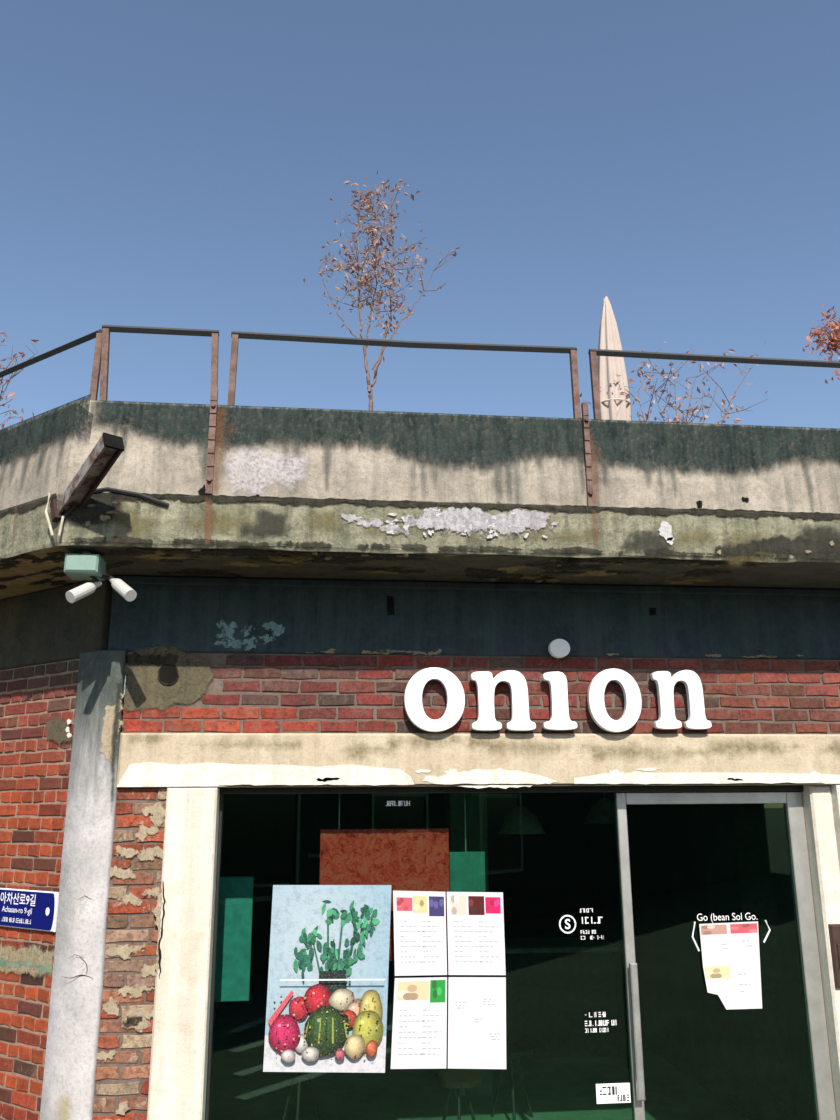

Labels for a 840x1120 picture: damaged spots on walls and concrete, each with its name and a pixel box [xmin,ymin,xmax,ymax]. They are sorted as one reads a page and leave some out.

damp [0,394,840,494]
peeling [341,506,558,539]
peeling [209,620,285,650]
peeling [99,683,557,801]
peeling [574,768,840,784]
spalling [153,881,166,979]
peeling [0,945,55,977]